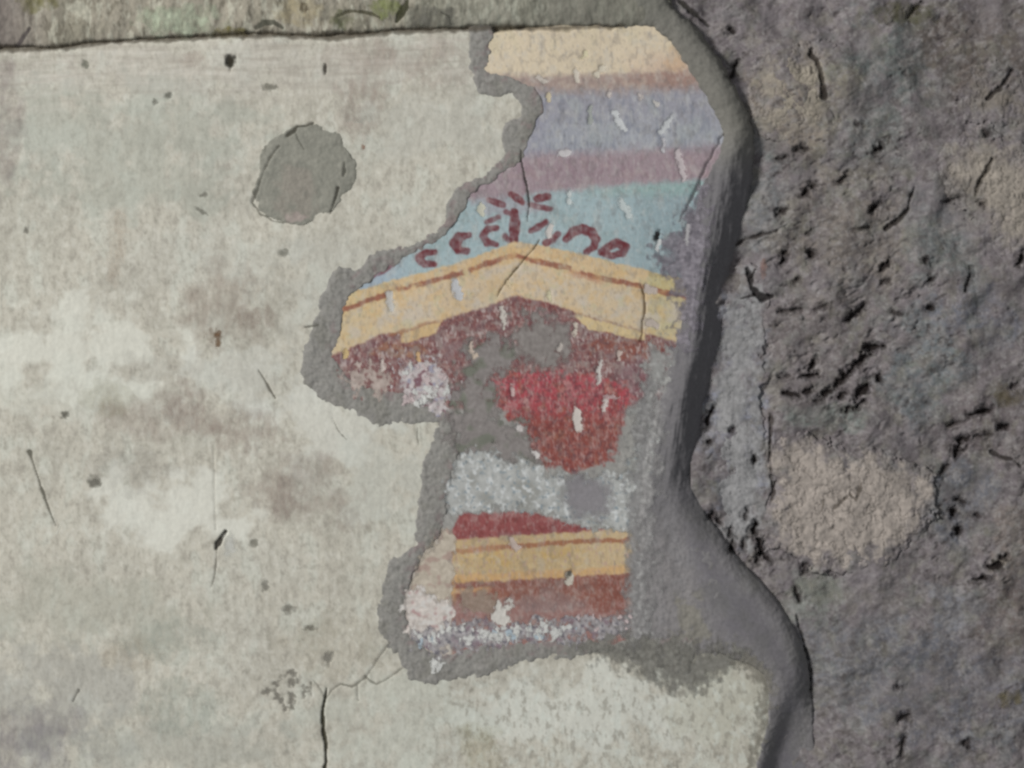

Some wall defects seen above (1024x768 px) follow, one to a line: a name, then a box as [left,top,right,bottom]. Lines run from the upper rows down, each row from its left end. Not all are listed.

crack [520,150,530,218]
peeling [607,89,627,132]
peeling [658,114,687,182]
spalling [340,306,674,533]
spalling [399,528,633,674]
crack [320,690,328,768]